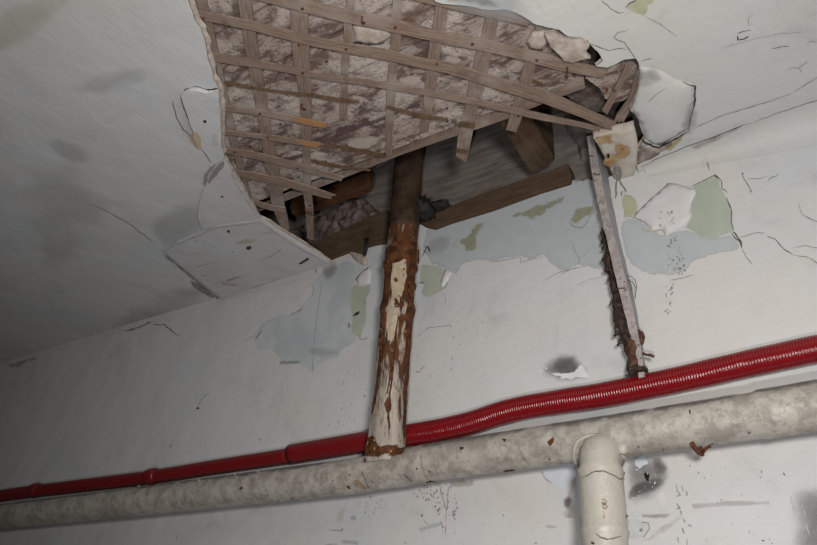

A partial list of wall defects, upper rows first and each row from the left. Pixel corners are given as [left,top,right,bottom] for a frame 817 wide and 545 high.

crack [590,0,652,62]
peeling [625,0,654,15]
crack [641,14,817,167]
peeling [189,0,371,371]
peeling [420,179,604,297]
peeling [622,175,739,280]
crack [731,232,817,264]
rust [364,238,418,462]